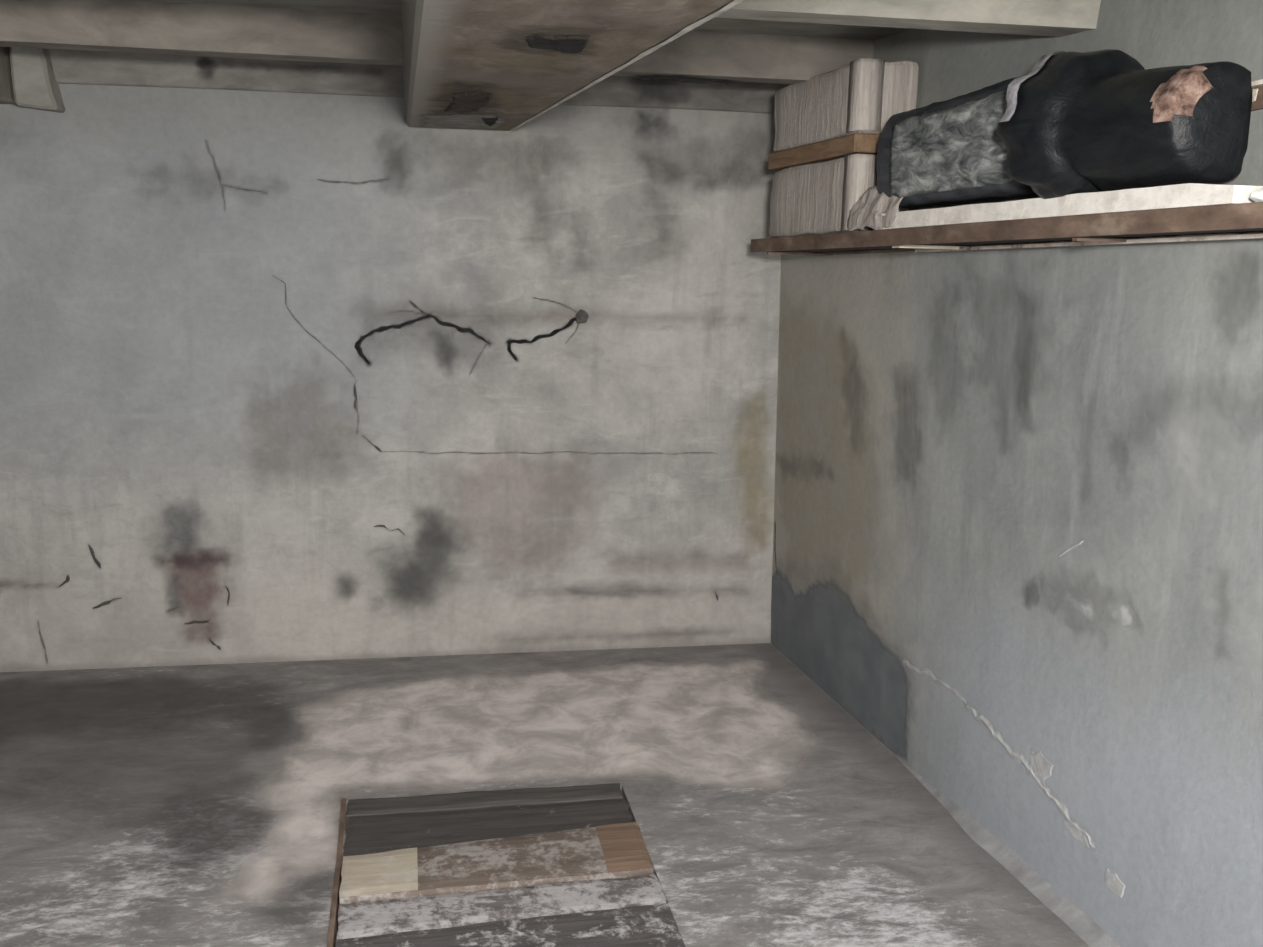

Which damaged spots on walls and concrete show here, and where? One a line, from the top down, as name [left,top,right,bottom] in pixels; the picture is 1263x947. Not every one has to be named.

spalling [421,0,744,132]
crack [206,142,265,208]
crack [272,275,717,454]
crack [904,660,1126,898]